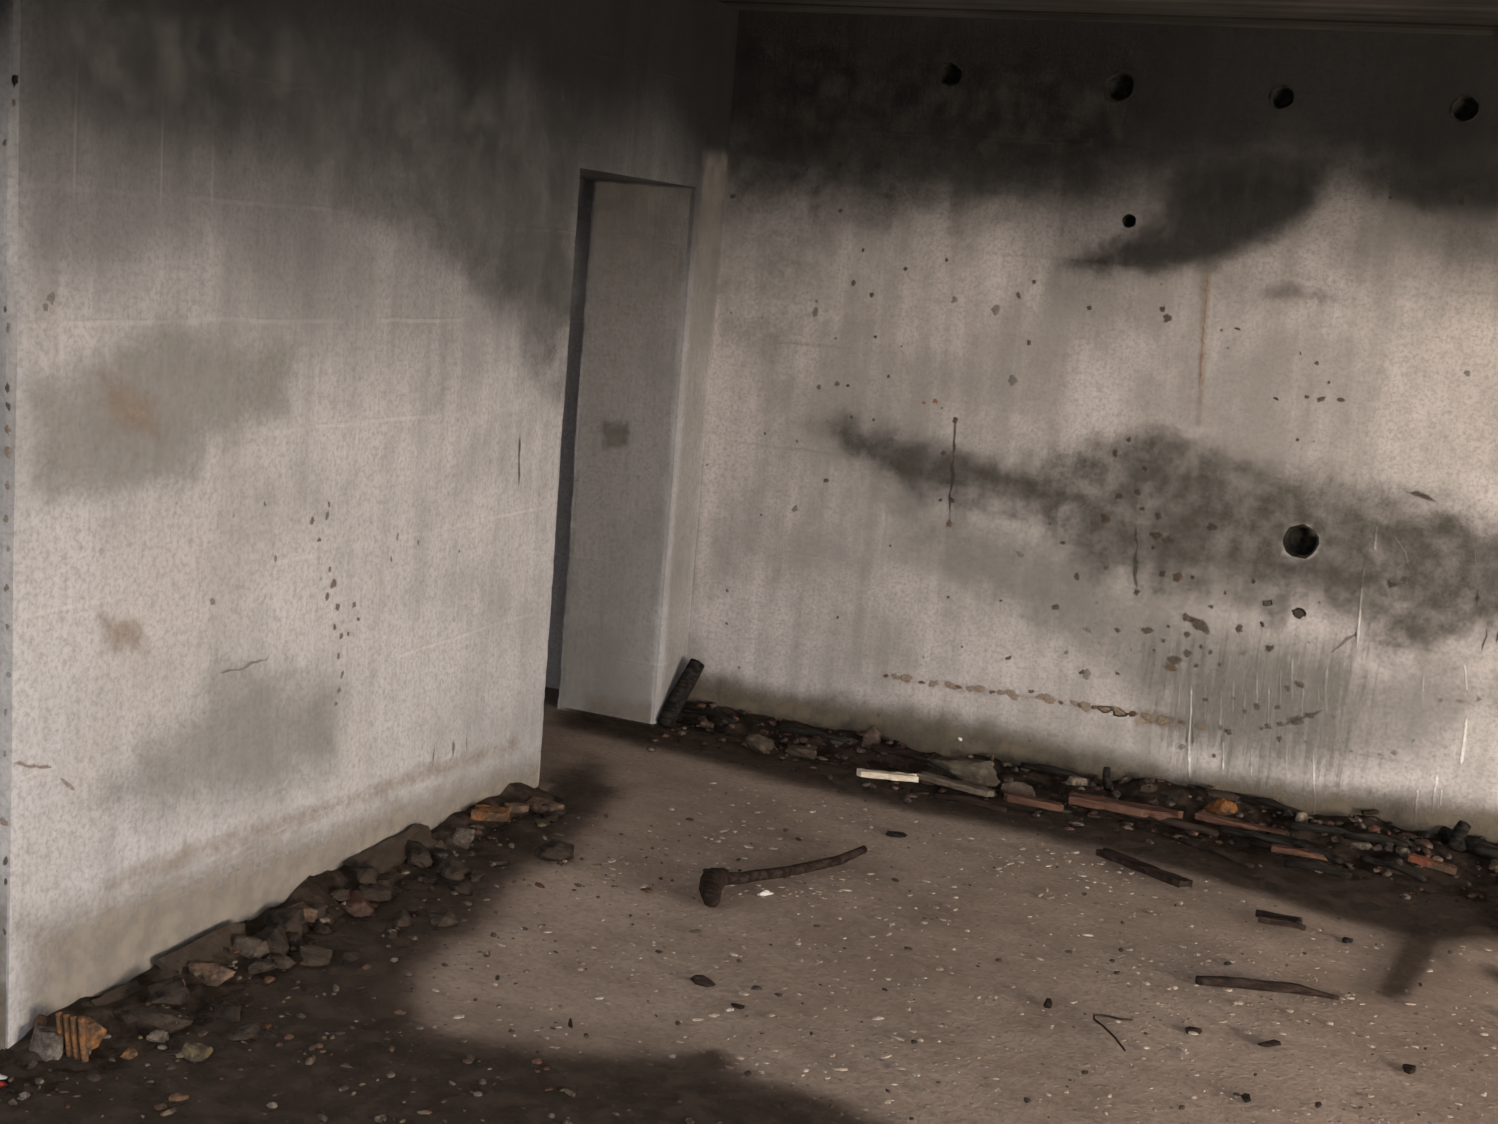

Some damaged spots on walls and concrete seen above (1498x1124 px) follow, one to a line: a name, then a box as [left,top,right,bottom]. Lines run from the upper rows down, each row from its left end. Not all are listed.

damp [840,417,1498,649]
corrosion [883,673,1207,729]